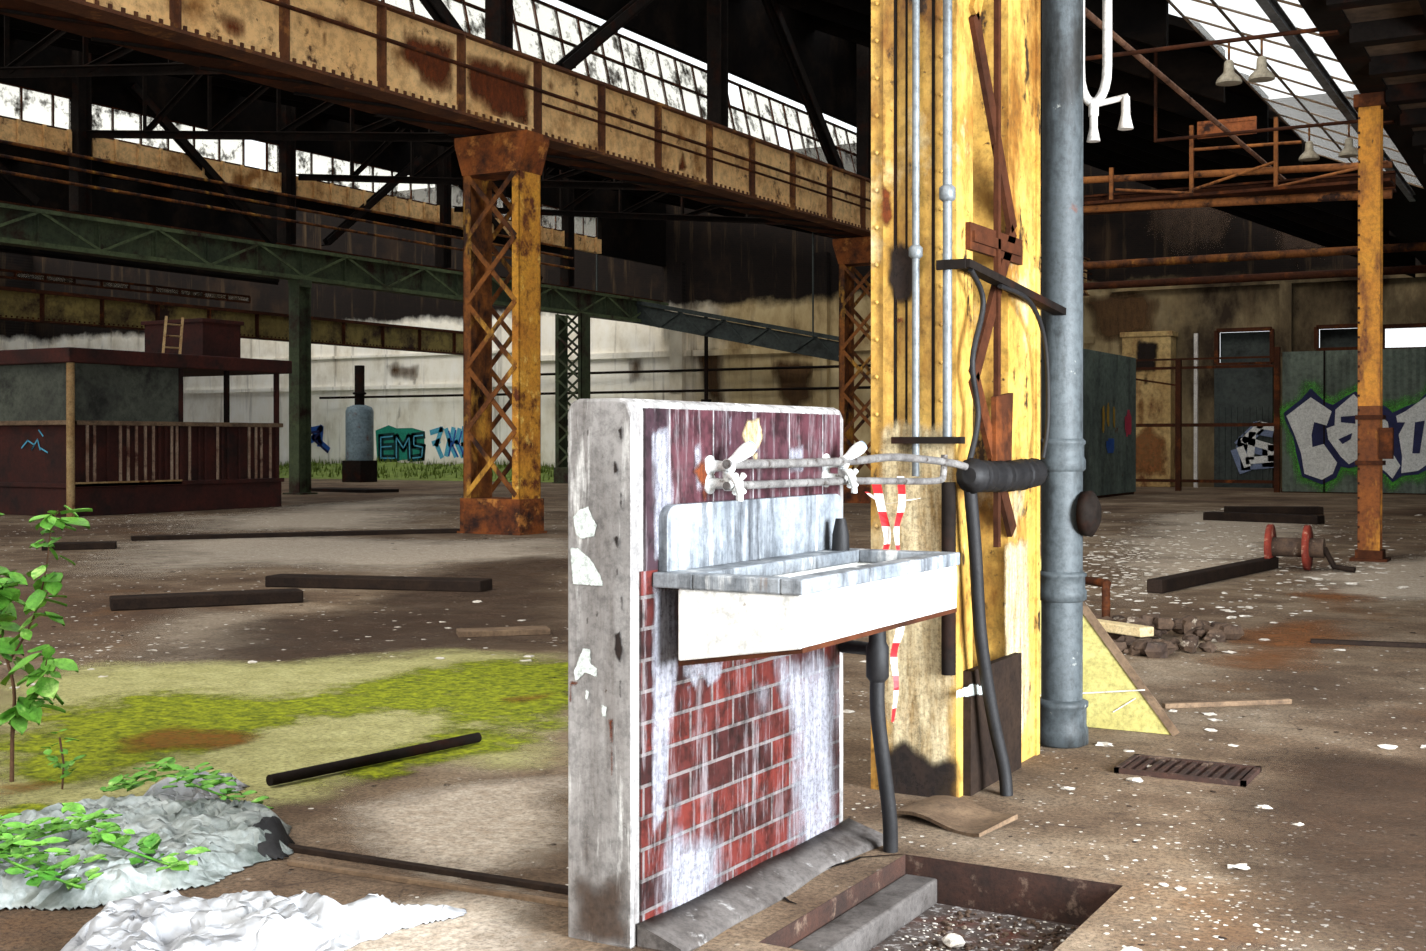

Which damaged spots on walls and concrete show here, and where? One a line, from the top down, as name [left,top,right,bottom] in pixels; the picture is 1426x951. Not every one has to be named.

rust [401,37,529,124]
peeling [570,507,618,586]
peeling [574,649,607,717]
spalling [614,632,622,661]
efflorescence [654,589,722,823]
efflorescence [782,667,834,840]